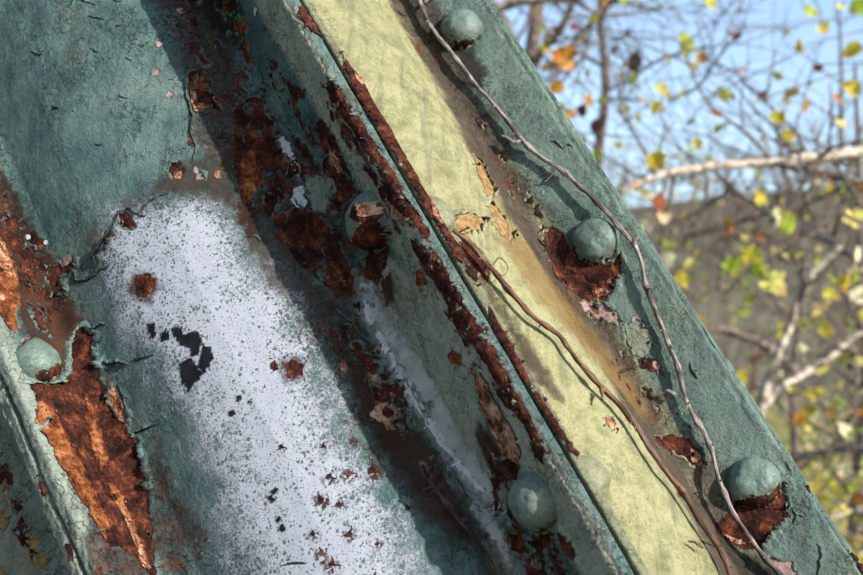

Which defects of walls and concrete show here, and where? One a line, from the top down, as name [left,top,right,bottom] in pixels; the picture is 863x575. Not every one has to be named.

peeling [0,240,53,348]
peeling [24,230,80,302]
corrosion [0,184,111,401]
peeling [99,209,138,251]
peeling [129,272,157,301]
corrosion [181,0,517,493]
peeling [164,51,581,575]
corrosion [505,177,561,257]
corrosion [562,284,605,325]
peeling [23,320,167,575]
corrosion [476,423,570,575]
corrosion [624,381,667,425]